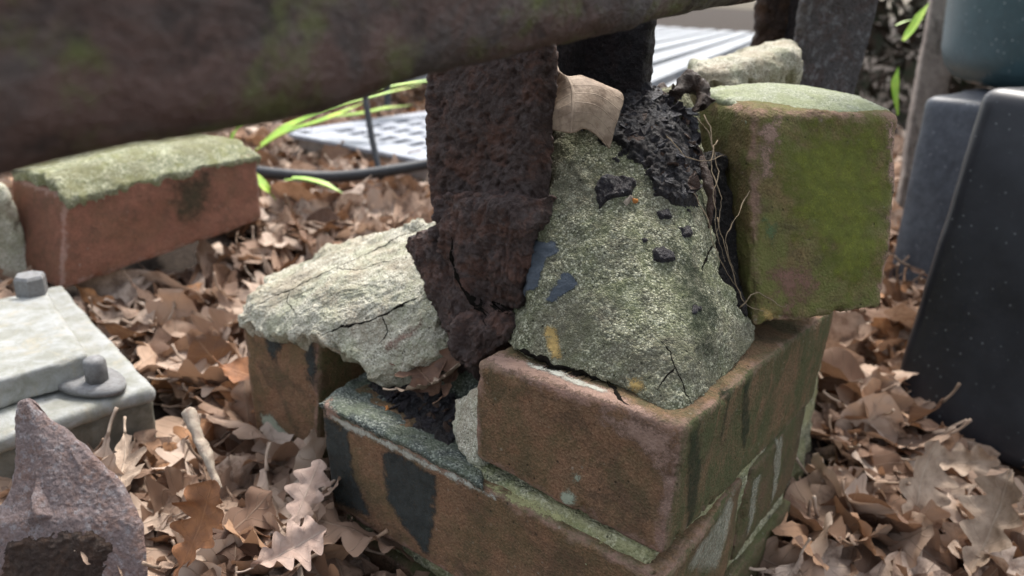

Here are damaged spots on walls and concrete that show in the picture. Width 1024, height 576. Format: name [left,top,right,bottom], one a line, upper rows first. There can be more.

crack [322,294,424,345]
crack [659,341,691,402]
leakage [324,409,496,554]